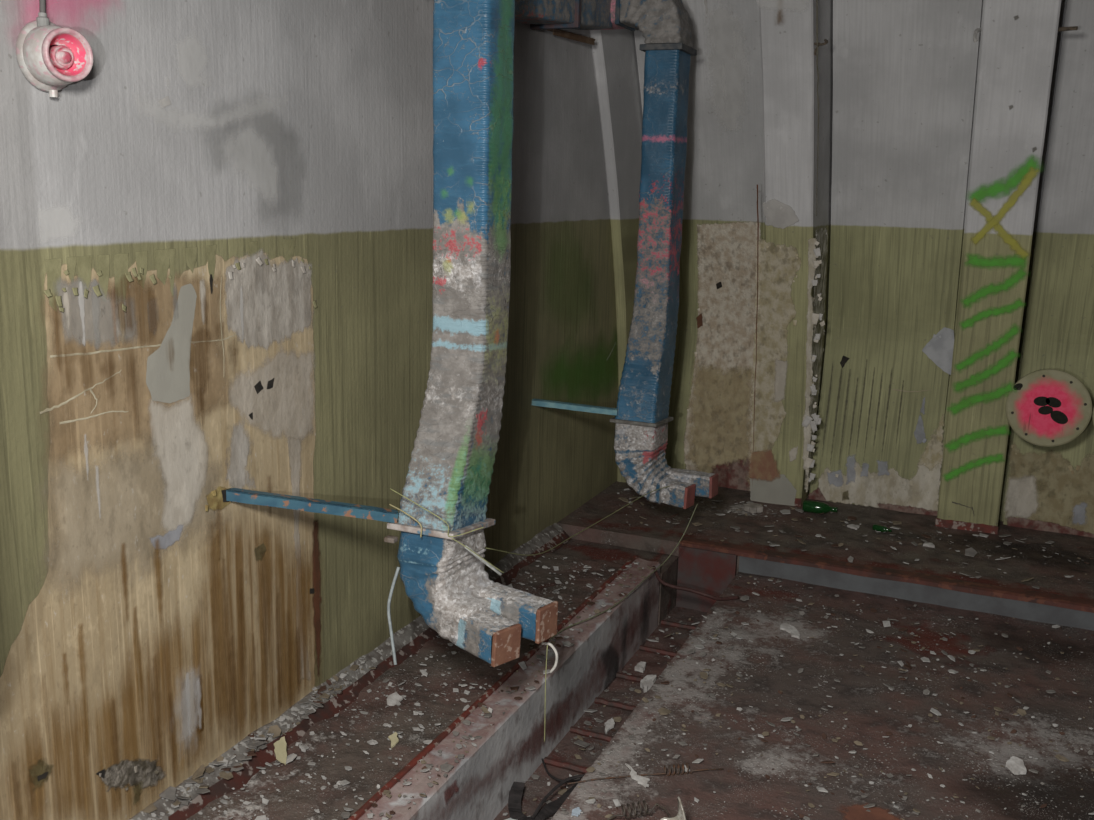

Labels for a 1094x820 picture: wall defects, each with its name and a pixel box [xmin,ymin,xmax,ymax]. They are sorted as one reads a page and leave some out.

peeling [0,238,655,820]
peeling [615,199,1094,589]